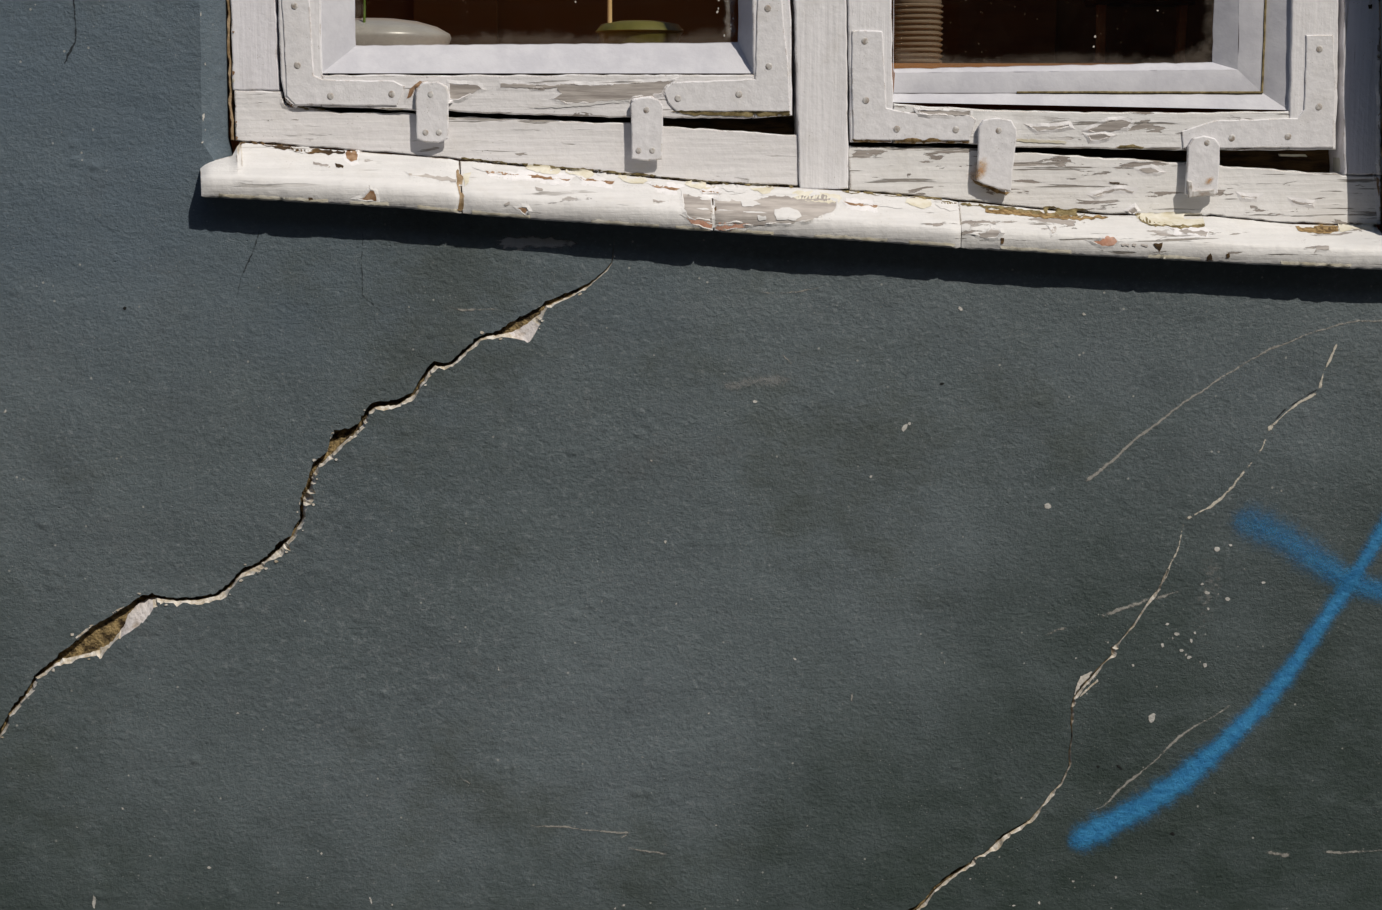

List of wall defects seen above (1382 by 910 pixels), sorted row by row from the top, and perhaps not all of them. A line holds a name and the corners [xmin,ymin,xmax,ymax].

peeling [235,121,363,173]
peeling [351,185,380,202]
peeling [403,116,1230,261]
peeling [913,107,974,119]
crack [0,246,615,738]
crack [908,344,1337,910]